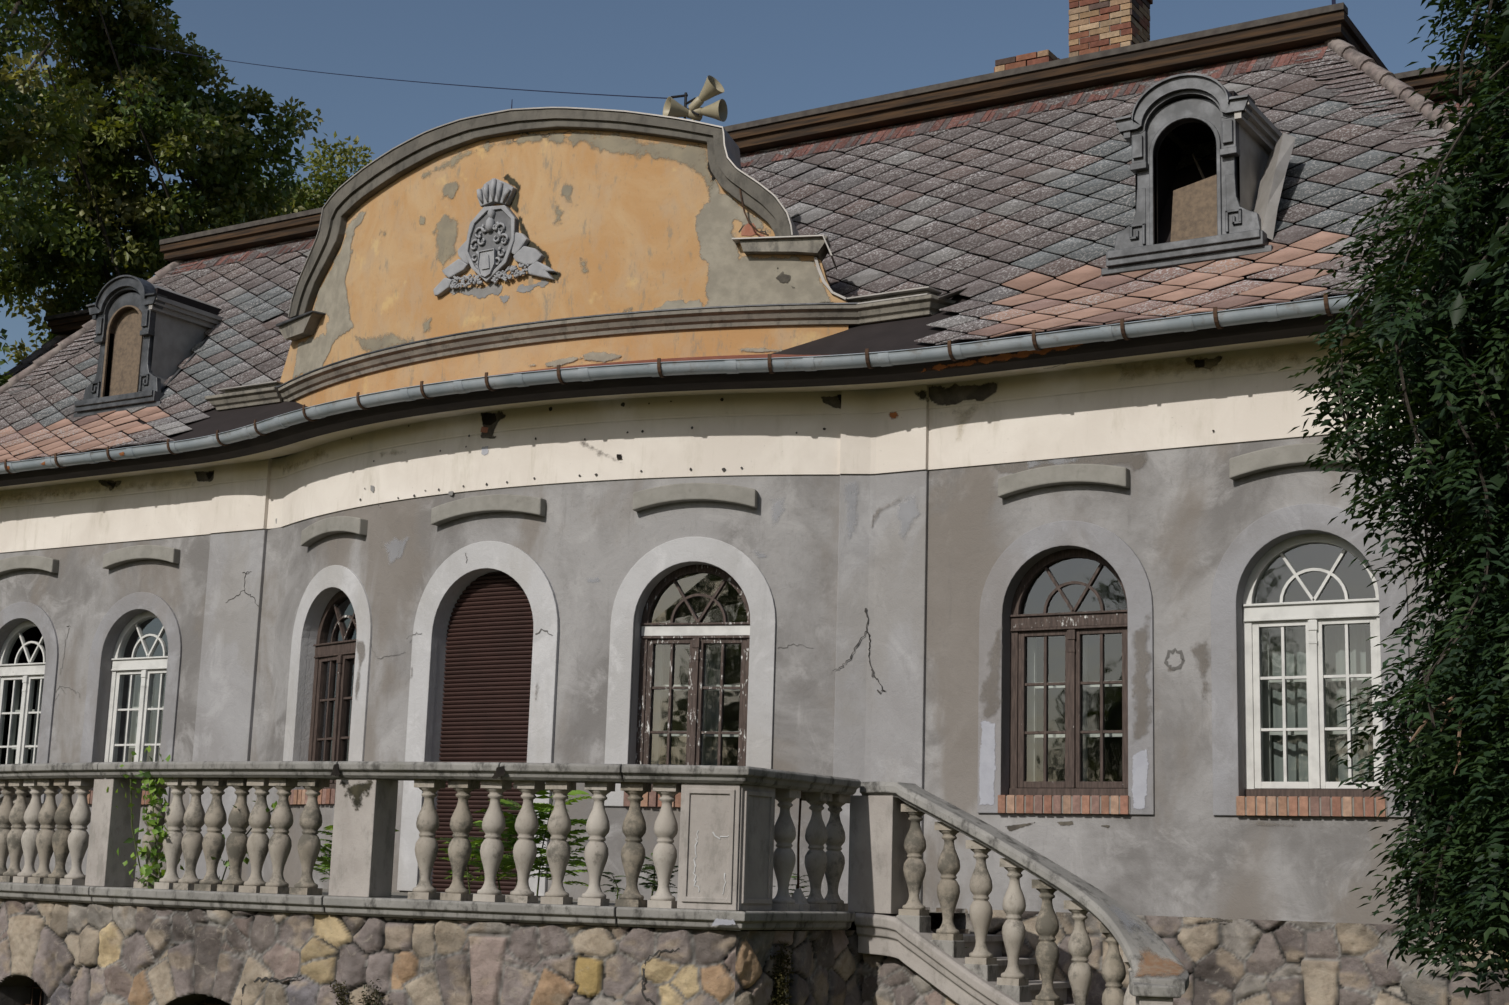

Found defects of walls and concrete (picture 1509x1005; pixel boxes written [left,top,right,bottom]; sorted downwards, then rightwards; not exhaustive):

peeling [293,212,431,378]
peeling [419,131,833,310]
crack [778,608,885,693]